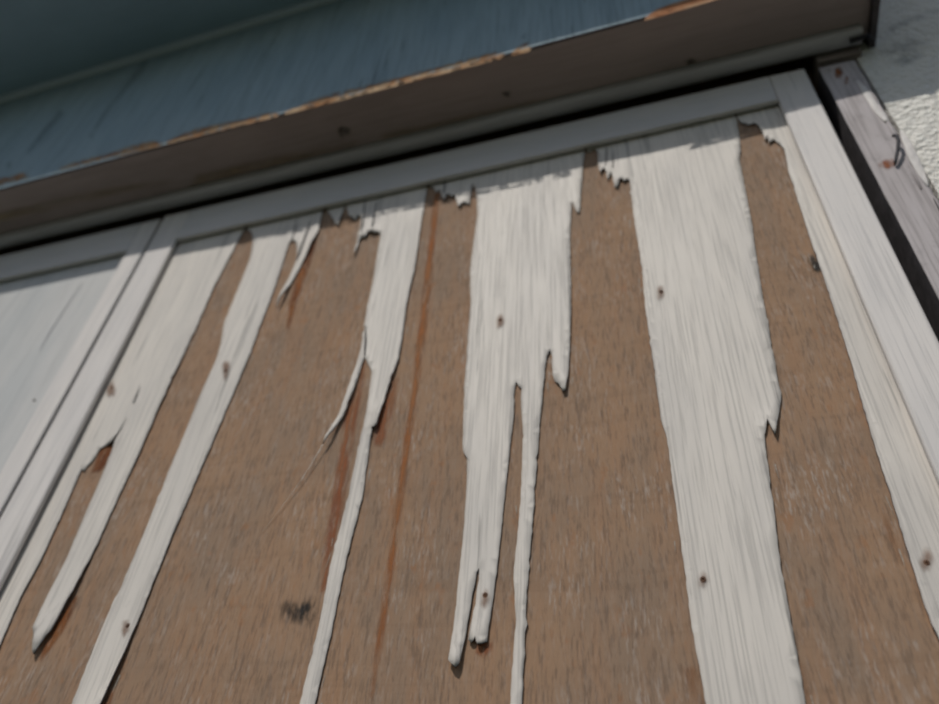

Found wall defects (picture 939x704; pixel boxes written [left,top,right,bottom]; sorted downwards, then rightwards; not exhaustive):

peeling [856,80,929,189]
peeling [0,226,253,704]
peeling [105,148,706,704]
corrosion [388,194,439,582]
peeling [735,114,939,704]